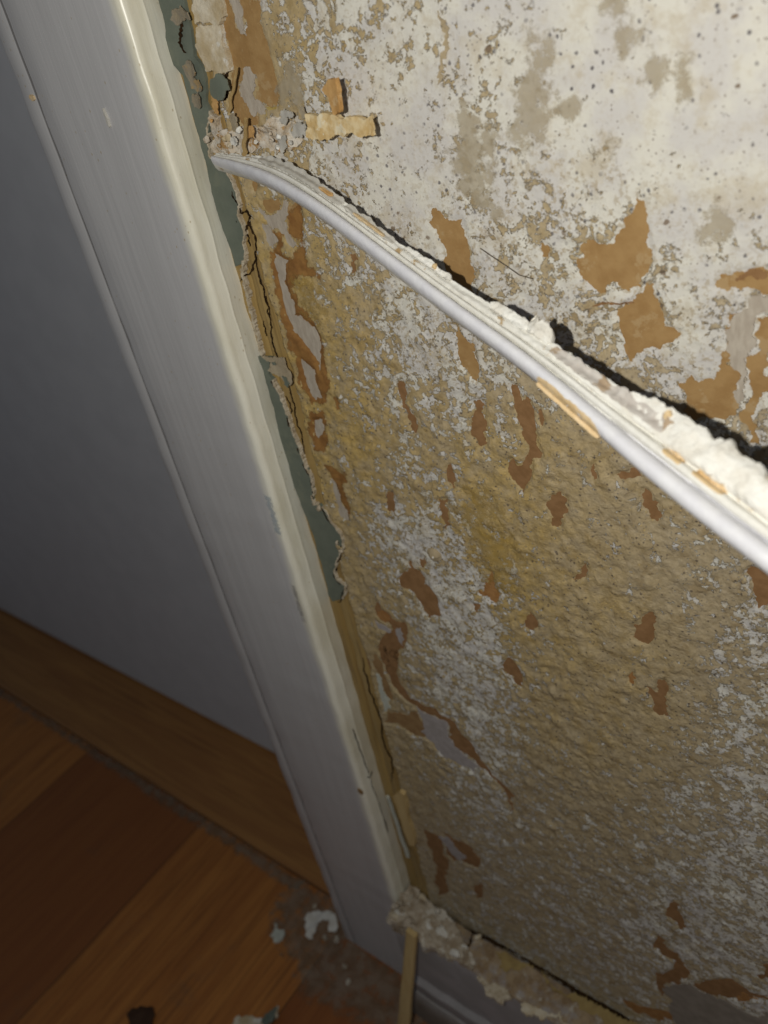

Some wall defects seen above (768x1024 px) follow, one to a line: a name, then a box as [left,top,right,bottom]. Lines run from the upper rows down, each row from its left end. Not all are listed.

peeling [159,0,396,266]
crack [231,191,278,357]
peeling [429,208,476,295]
crack [592,300,634,308]
peeling [576,198,681,362]
peeling [715,267,768,295]
peeling [536,377,600,439]
peeling [550,346,674,433]
peeling [677,316,768,444]
peeling [747,566,768,608]
peeling [366,602,515,812]
crack [464,927,633,1021]